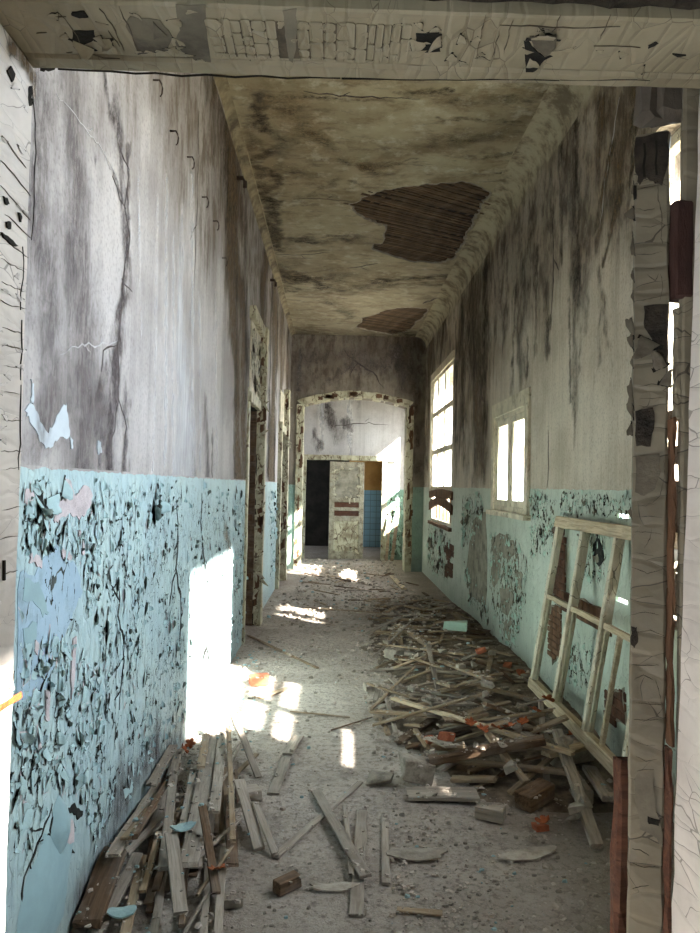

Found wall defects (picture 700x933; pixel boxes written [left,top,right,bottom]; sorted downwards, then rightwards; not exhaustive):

peeling [0,196,29,246]
crack [0,86,37,470]
peeling [0,348,73,449]
leakage [28,144,61,432]
crack [56,93,132,468]
leakage [66,73,131,470]
peeling [8,468,300,894]
leakage [210,80,250,480]
peeling [126,4,490,66]
crack [36,7,650,221]
peeling [426,304,673,690]
leakage [550,86,637,344]